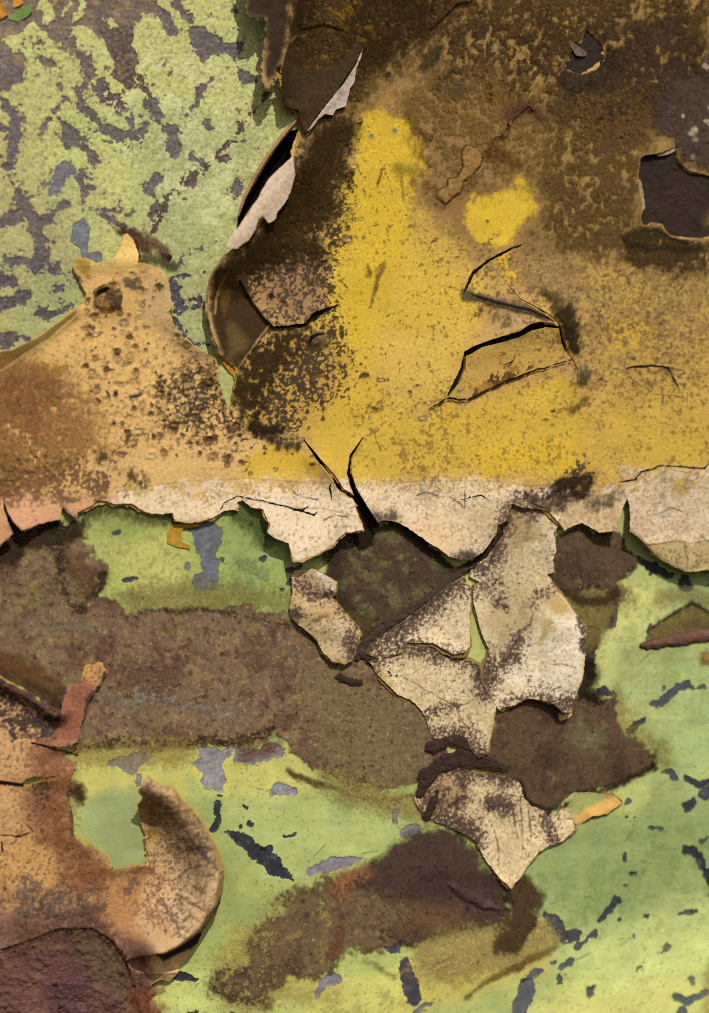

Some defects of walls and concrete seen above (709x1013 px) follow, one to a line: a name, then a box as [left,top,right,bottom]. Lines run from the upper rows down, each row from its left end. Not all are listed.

water stain [281,0,709,260]
crack [465,242,525,291]
peeling [0,0,709,758]
crack [430,310,572,409]
crack [218,439,362,516]
rust [639,628,709,664]
peeling [0,662,298,991]
peeling [306,856,363,877]
peeling [392,767,636,890]
peeling [682,836,709,895]
rust [0,908,165,1013]